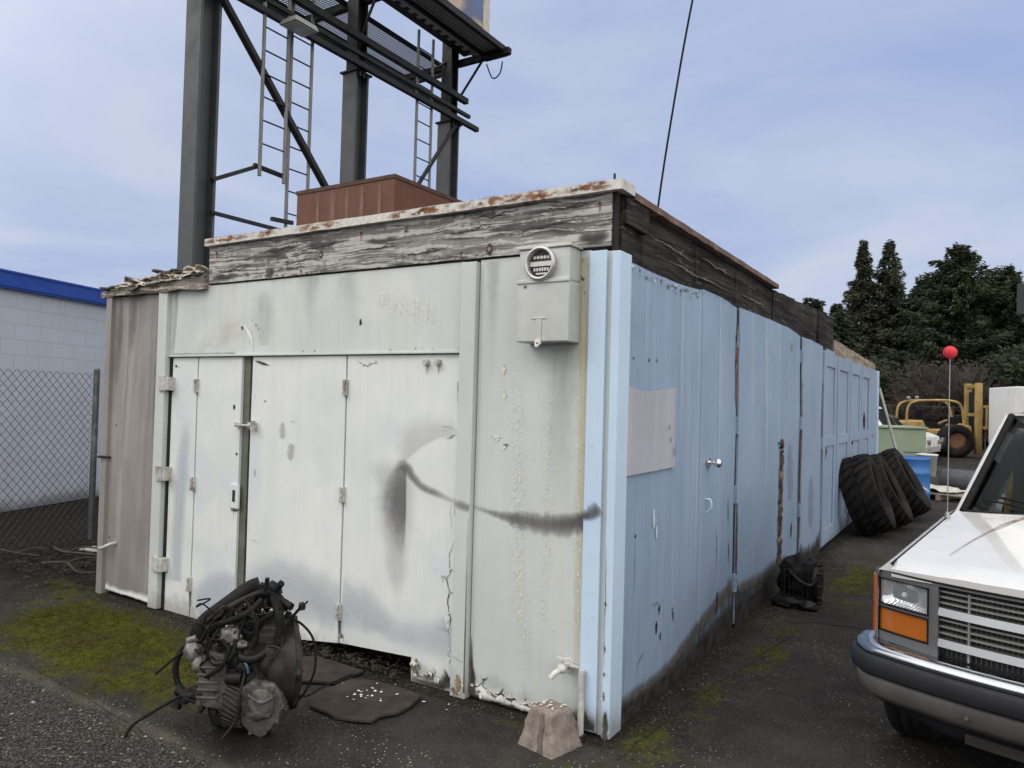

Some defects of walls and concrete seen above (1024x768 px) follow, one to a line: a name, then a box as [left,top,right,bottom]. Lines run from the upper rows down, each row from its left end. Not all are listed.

corrosion [478,192,547,205]
corrosion [570,183,608,192]
crack [442,508,460,663]
damp [621,559,782,726]
peeling [410,658,439,683]
peeling [450,675,547,711]